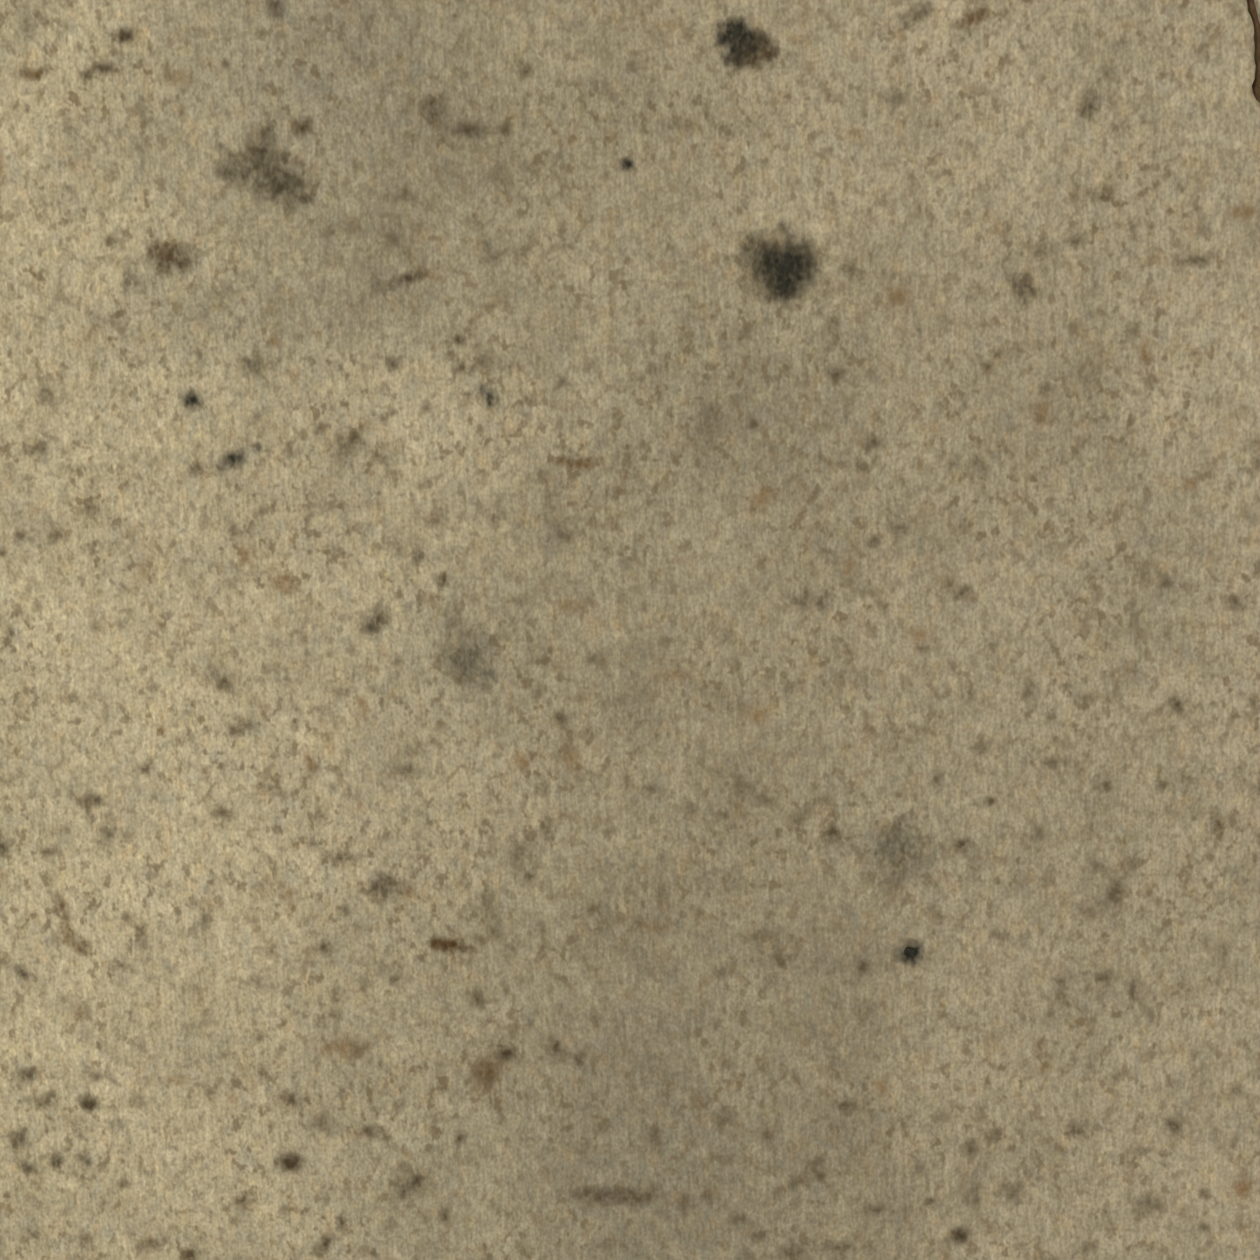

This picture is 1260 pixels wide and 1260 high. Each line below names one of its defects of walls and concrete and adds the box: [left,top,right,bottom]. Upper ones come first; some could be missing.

crack [1247,0,1260,103]